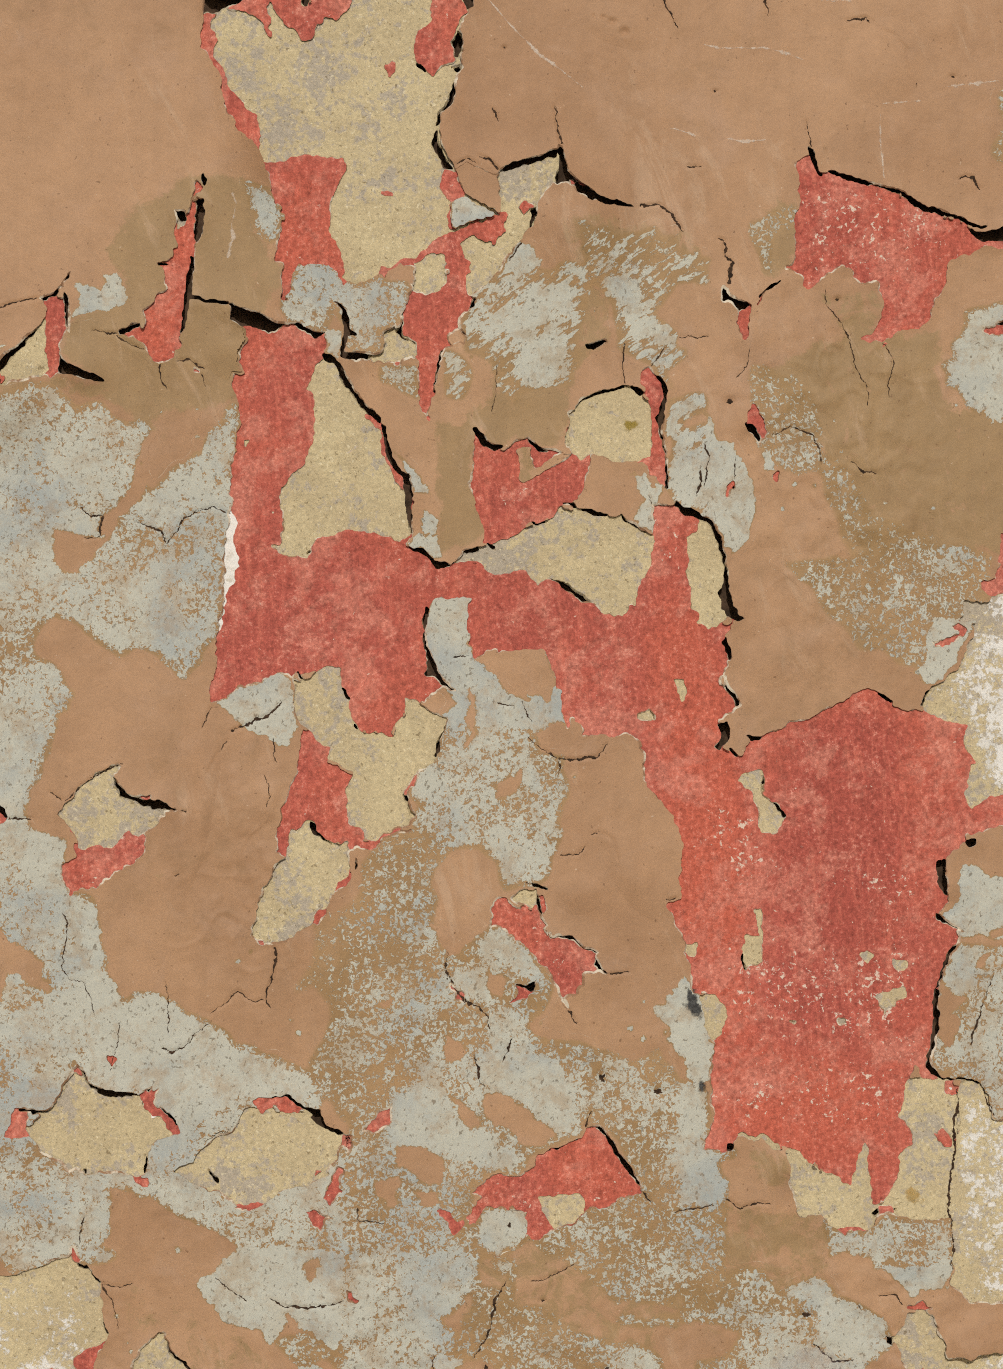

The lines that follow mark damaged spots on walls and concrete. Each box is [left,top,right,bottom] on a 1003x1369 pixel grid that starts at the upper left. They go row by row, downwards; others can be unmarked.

peeling [200,0,634,421]
crack [457,156,499,170]
crack [554,105,564,148]
peeling [742,147,1003,347]
crack [960,175,980,190]
crack [95,329,205,388]
peeling [0,268,326,1369]
peeling [119,181,1003,1369]